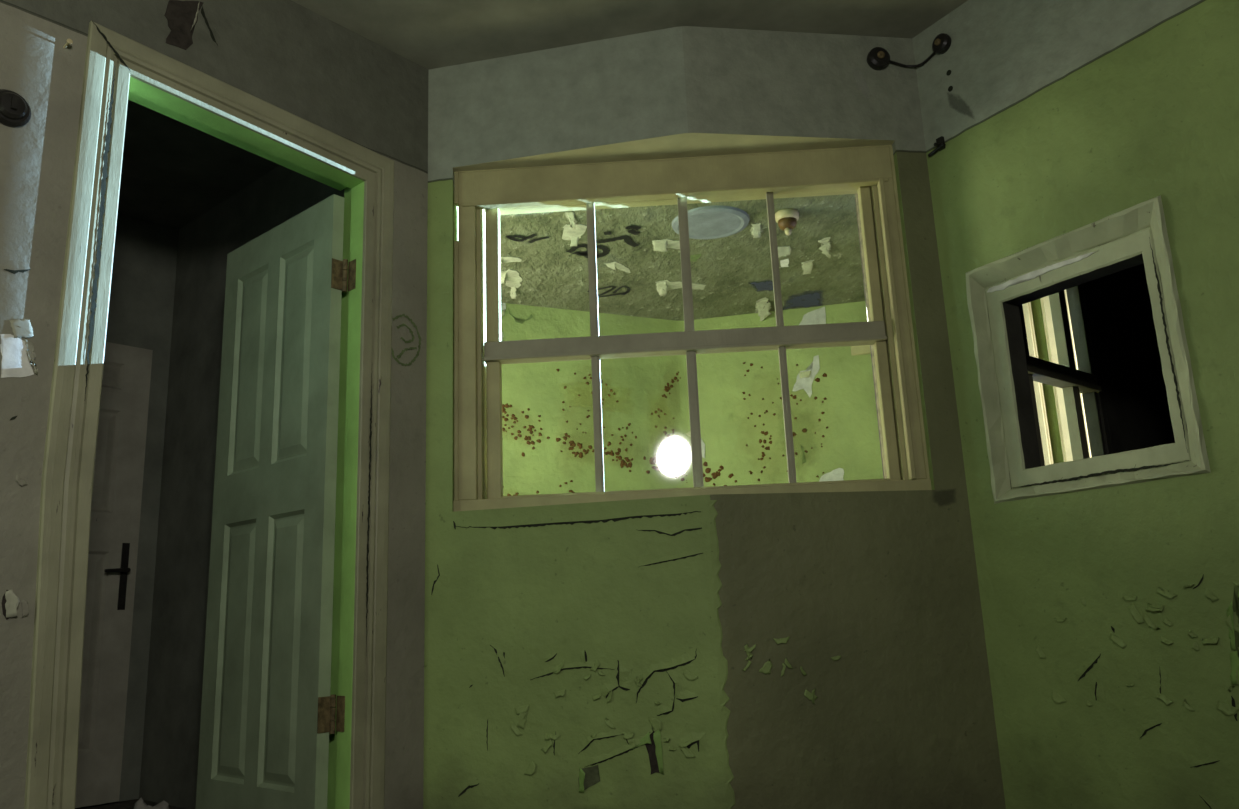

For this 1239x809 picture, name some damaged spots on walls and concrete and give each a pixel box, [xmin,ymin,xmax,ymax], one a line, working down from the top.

crack [446,503,713,567]
peeling [1226,586,1239,685]
peeling [578,765,600,792]
peeling [631,730,664,775]